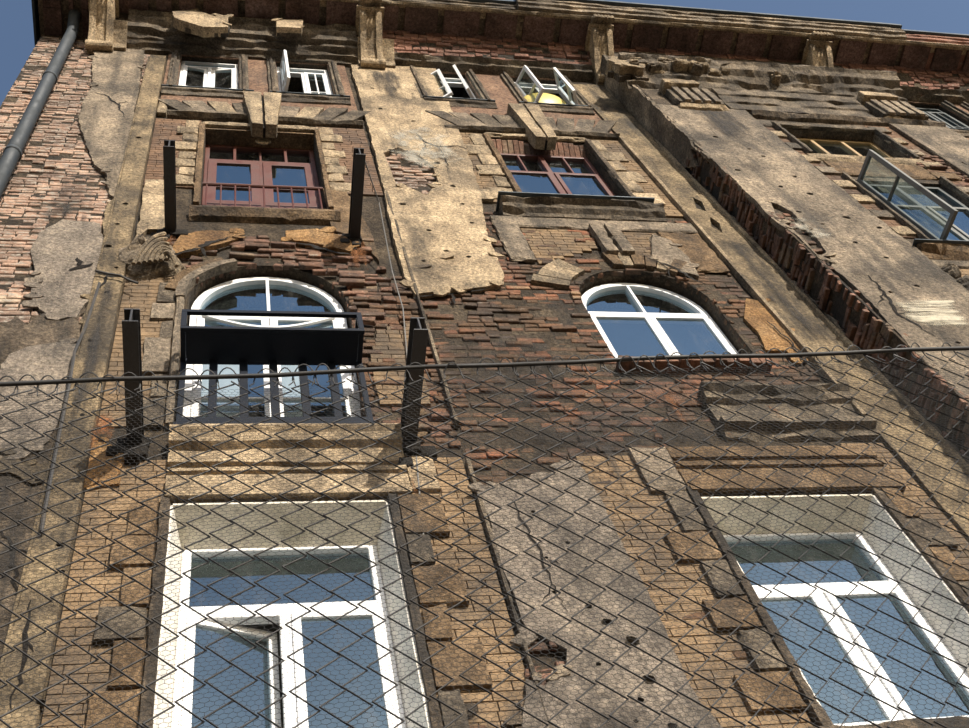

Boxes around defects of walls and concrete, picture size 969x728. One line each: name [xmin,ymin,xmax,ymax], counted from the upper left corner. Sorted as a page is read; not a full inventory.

flaking render [0,36,150,492]
flaking render [170,65,820,728]
flaking render [686,143,969,455]
crack [868,275,936,337]
crack [511,499,568,611]